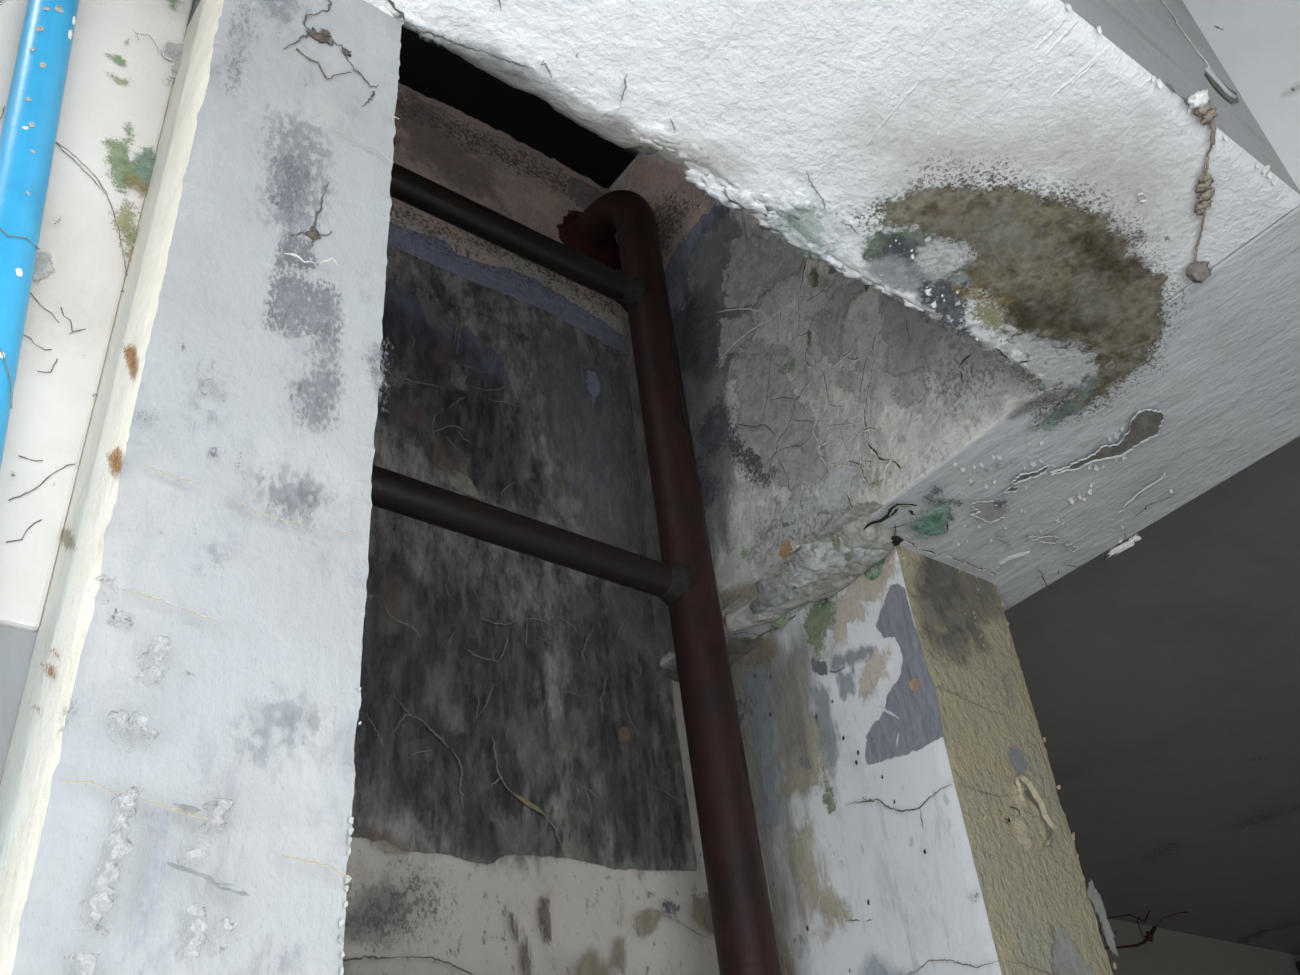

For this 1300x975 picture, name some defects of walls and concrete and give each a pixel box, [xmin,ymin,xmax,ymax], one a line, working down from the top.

leakage [266,236,343,431]
leakage [368,244,662,562]
leakage [672,209,777,566]
crack [732,254,997,576]
leakage [855,162,1177,427]
spalling [953,409,1165,546]
leakage [350,506,697,871]
peeling [783,694,827,798]
peeling [811,550,944,765]
crack [847,783,1009,829]
crack [343,955,474,975]
peeling [1087,879,1118,969]